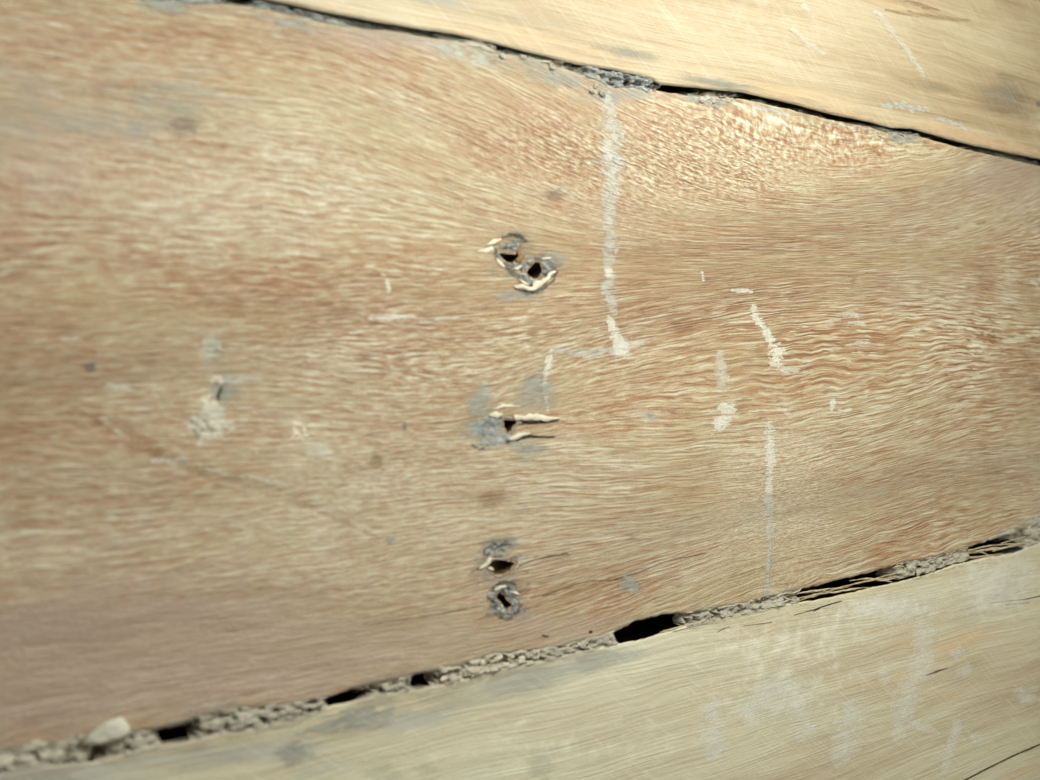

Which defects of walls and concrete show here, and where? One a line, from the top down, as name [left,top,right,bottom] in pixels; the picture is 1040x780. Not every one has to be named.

crack [964,744,1040,780]